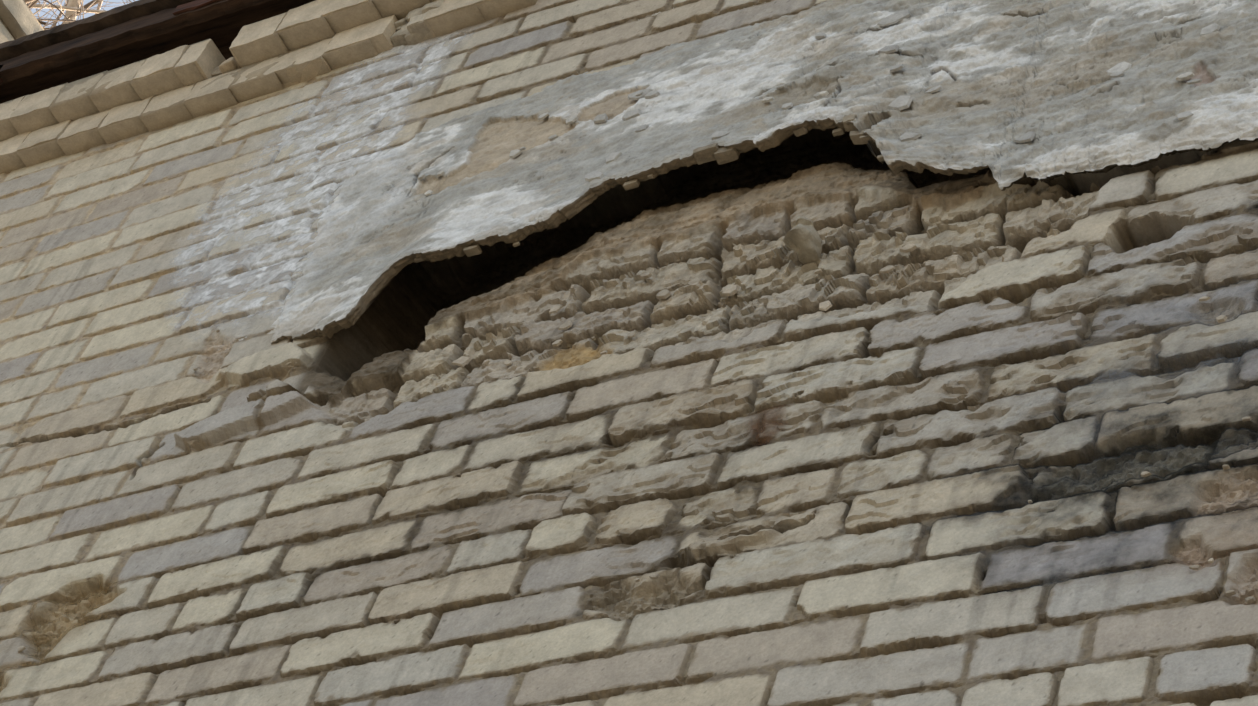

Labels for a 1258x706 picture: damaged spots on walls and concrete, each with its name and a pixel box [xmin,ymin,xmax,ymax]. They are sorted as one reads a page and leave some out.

flaking render [267,0,1258,432]
damp [1094,338,1257,382]
spalling [1025,415,1258,518]
spalling [17,576,125,664]
spalling [1173,539,1217,573]
spalling [1226,552,1258,605]